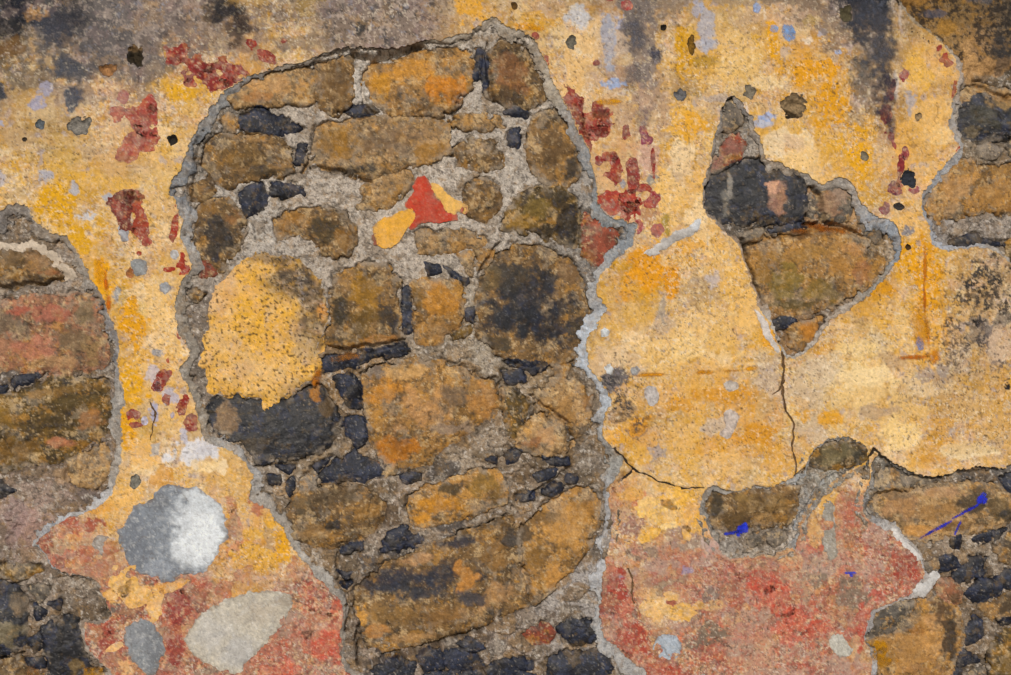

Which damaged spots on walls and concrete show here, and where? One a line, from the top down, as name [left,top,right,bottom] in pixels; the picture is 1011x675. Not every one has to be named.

water stain [213,0,246,48]
water stain [846,0,896,132]
peeling [106,189,152,256]
flaking render [702,0,1011,359]
flaking render [163,17,705,675]
flaking render [0,203,260,675]
crack [614,447,705,490]
crack [772,351,806,474]
flaking render [627,436,1011,675]